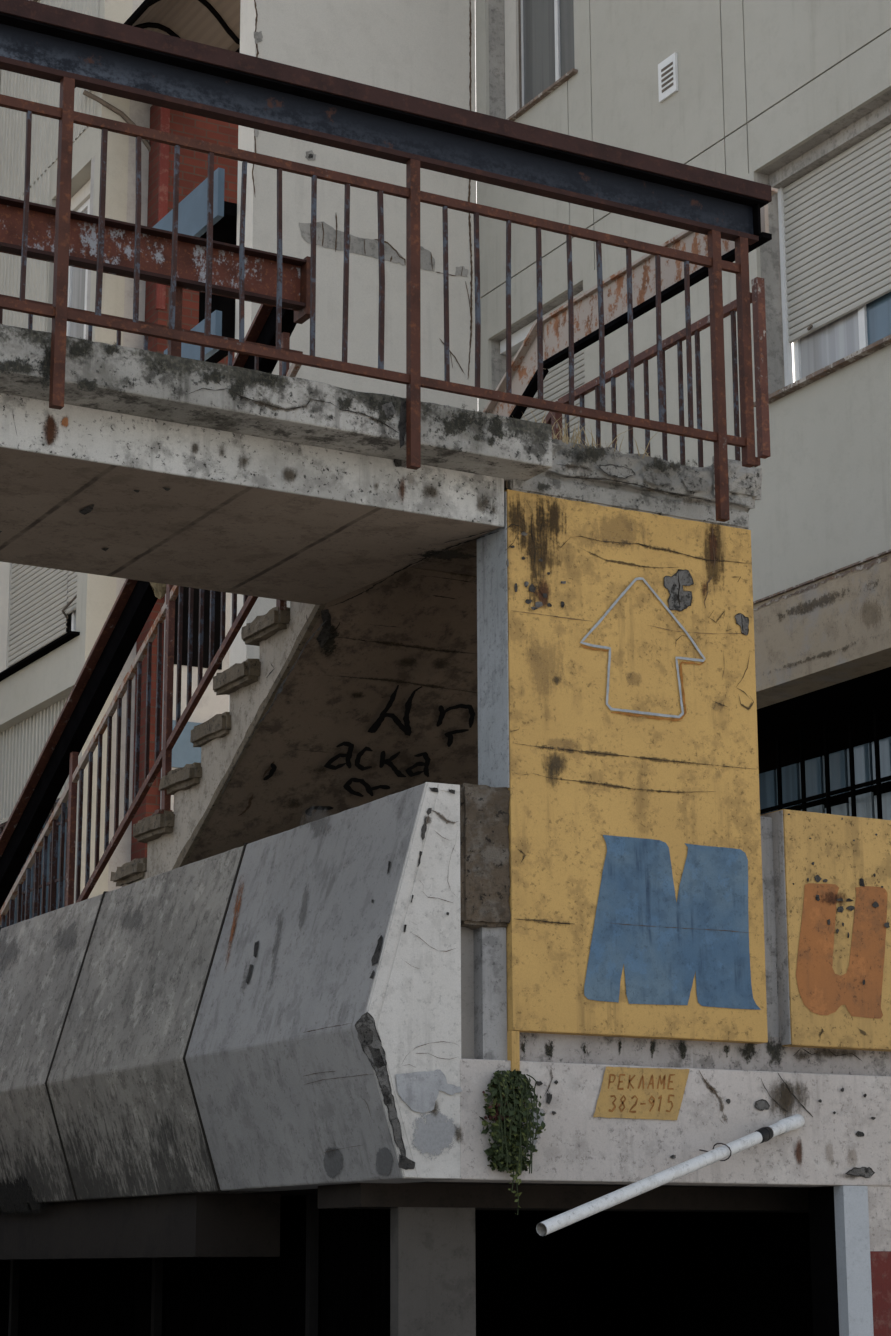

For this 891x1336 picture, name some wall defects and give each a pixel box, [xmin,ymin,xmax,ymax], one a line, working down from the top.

peeling [299,215,468,277]
spalling [355,1012,415,1170]